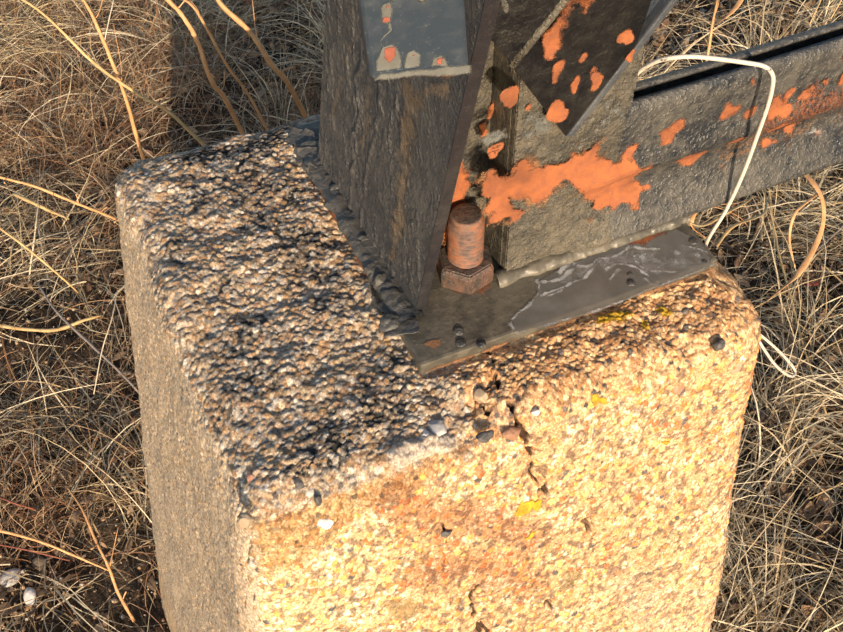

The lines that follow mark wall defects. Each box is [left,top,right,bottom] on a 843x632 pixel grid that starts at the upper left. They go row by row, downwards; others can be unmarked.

corrosion [479,86,519,137]
corrosion [660,119,685,146]
corrosion [720,104,757,120]
corrosion [727,74,843,161]
corrosion [677,150,708,167]
corrosion [442,138,652,246]
crack [481,352,548,493]
crack [468,584,489,632]